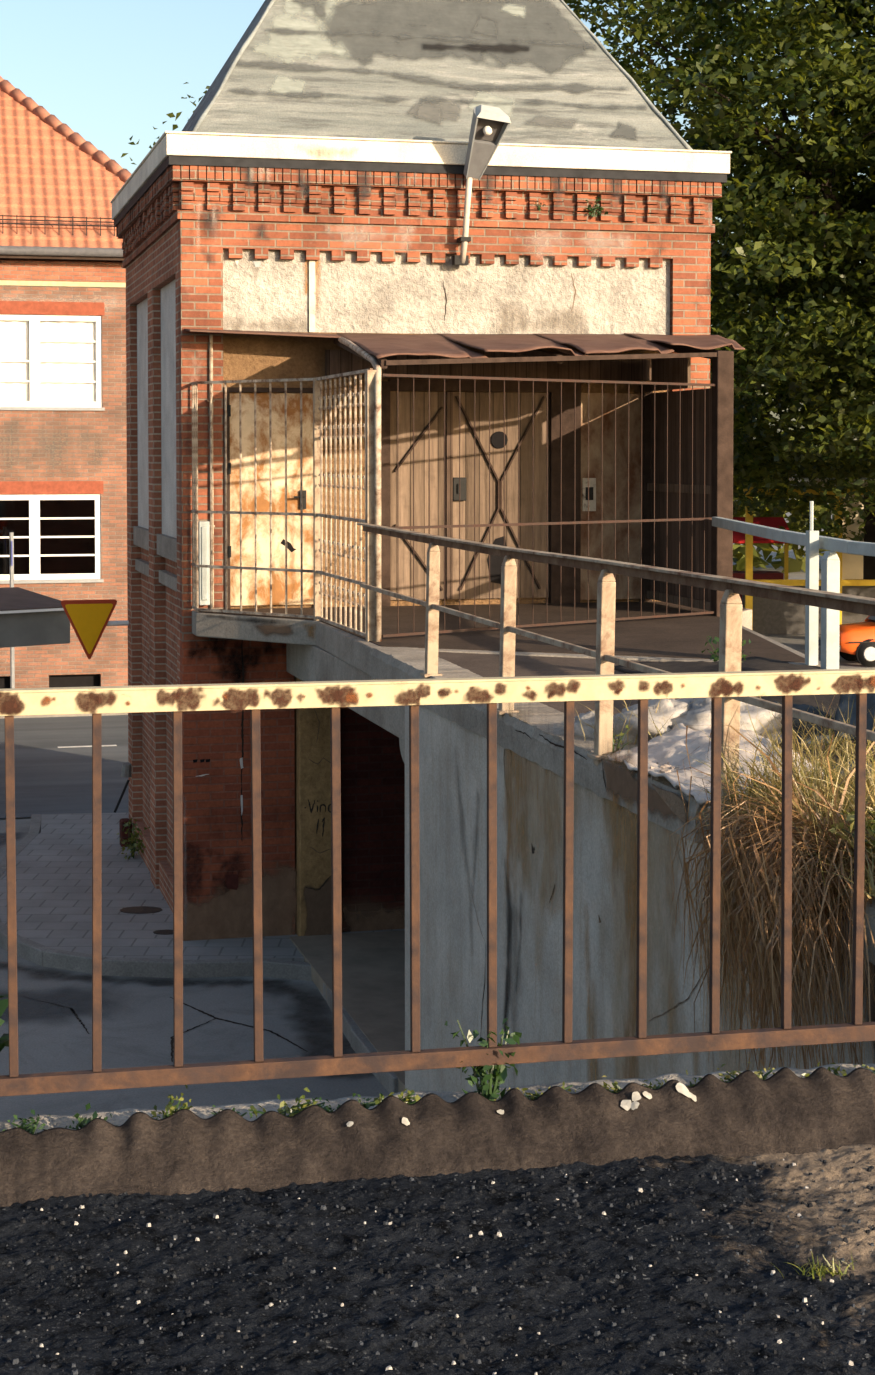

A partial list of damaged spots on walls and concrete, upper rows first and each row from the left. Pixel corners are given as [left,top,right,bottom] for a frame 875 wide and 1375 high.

rust [0,692,24,715]
rust [76,692,130,714]
rust [158,686,372,713]
crack [30,998,89,1034]
crack [170,997,308,1062]